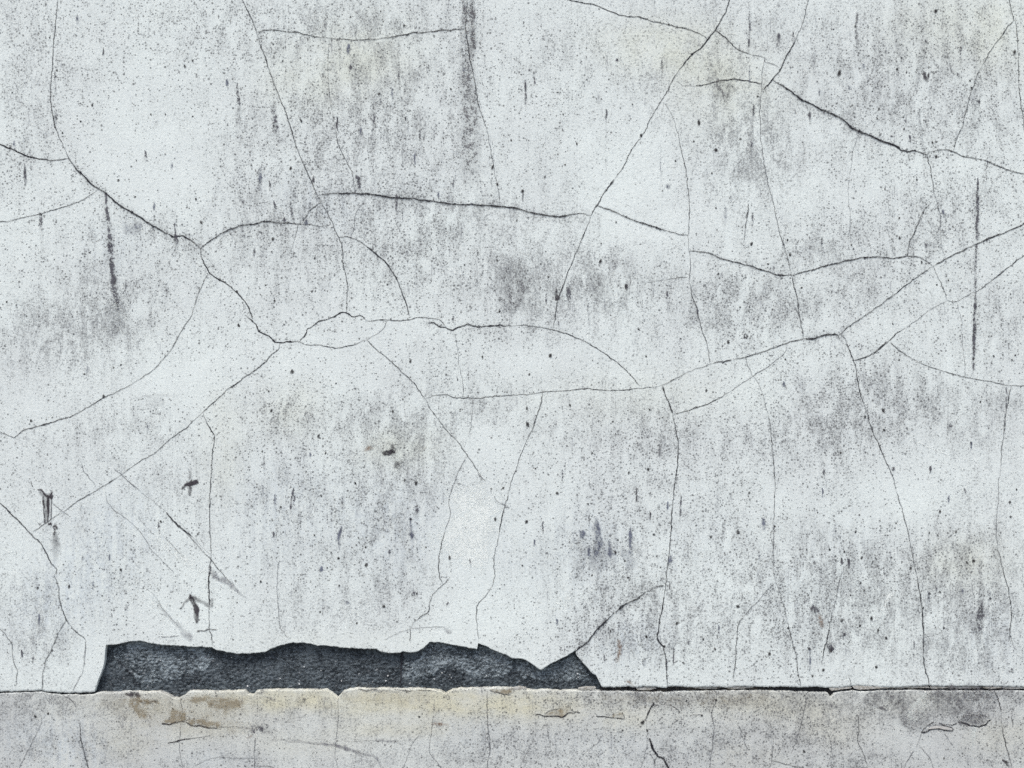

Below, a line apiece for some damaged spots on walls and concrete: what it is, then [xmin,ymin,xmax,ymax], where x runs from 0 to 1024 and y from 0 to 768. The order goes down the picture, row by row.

crack [50,2,61,141]
crack [242,0,328,38]
crack [345,3,485,123]
crack [570,0,1024,187]
crack [0,46,684,605]
crack [576,199,1024,725]
crack [0,602,96,702]
spalling [96,641,600,729]
crack [508,684,526,692]
crack [649,738,669,768]